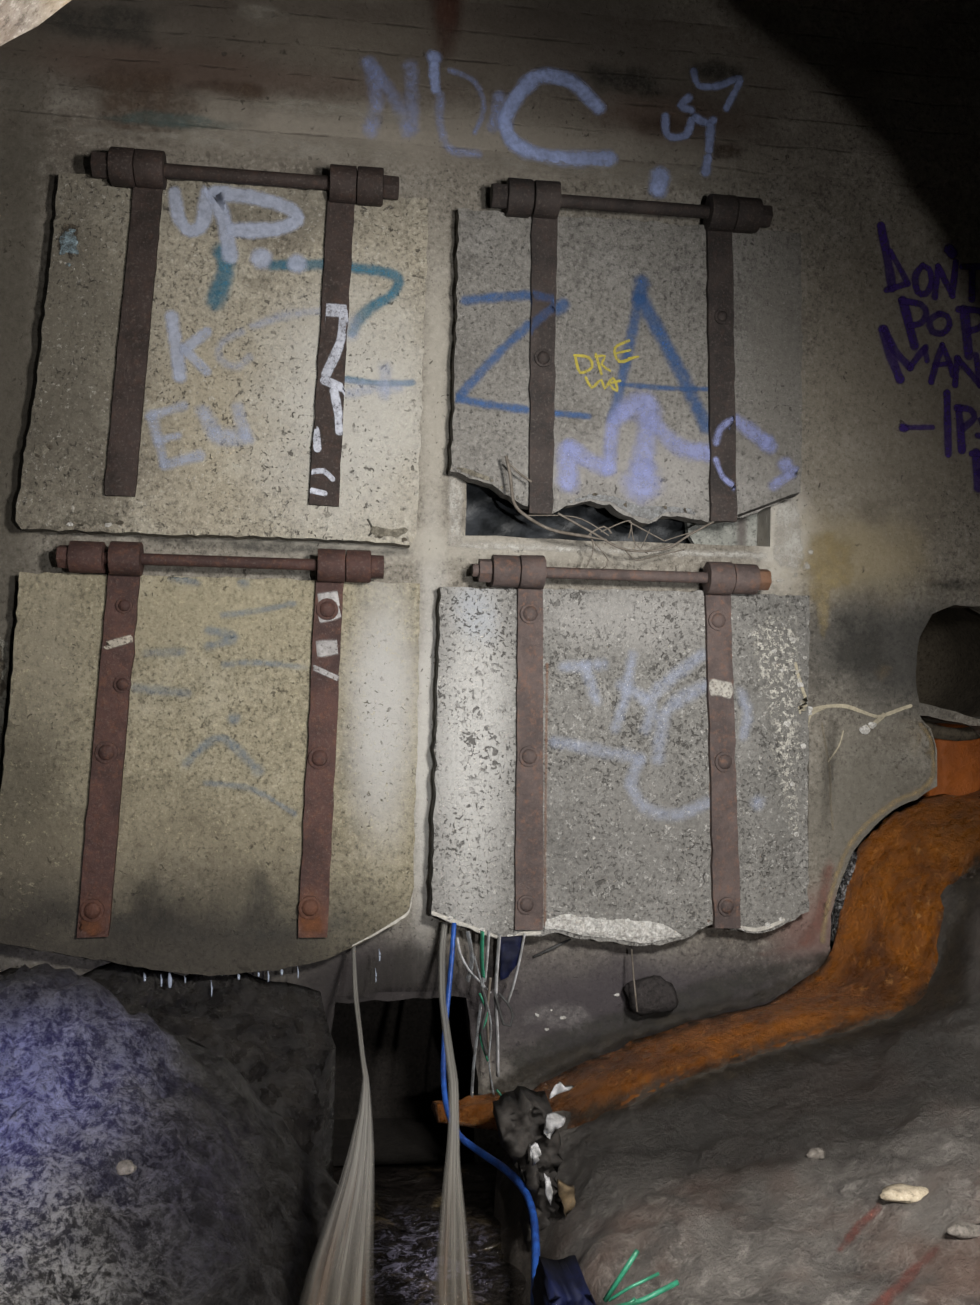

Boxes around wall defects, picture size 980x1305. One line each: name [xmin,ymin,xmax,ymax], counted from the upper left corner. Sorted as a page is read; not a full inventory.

peeling [449,467,813,581]
spalling [432,911,681,944]